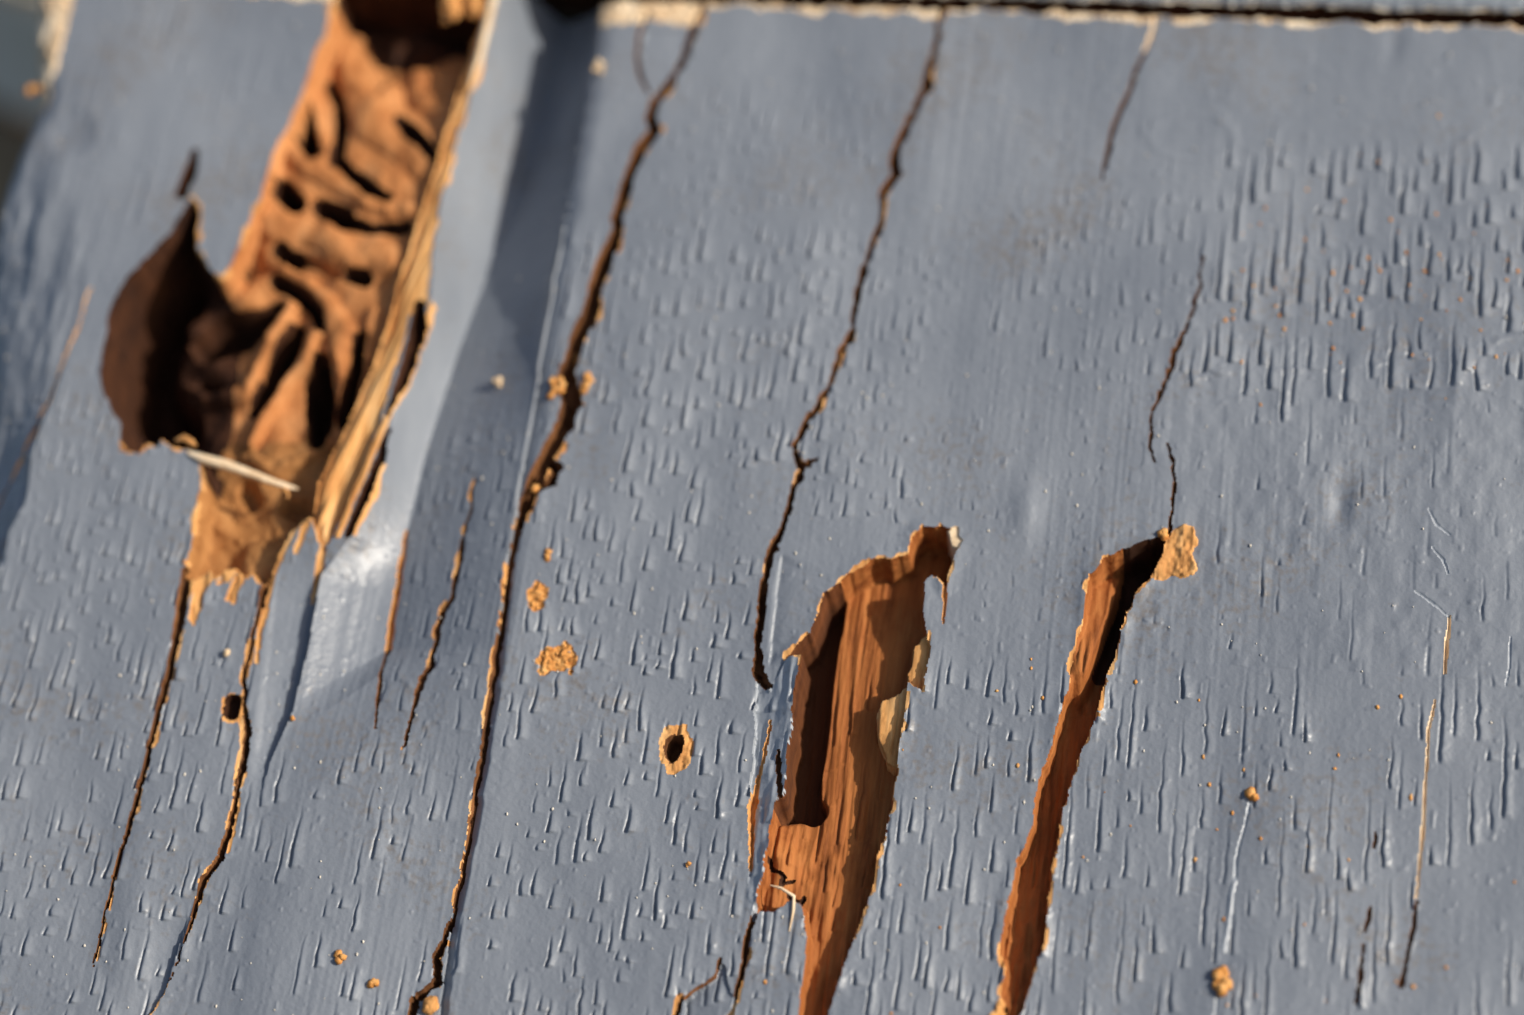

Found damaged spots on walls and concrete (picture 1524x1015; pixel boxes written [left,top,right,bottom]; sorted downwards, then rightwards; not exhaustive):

crack [1101,16,1158,180]
crack [92,565,195,967]
crack [149,585,268,1015]
spalling [100,0,497,664]
crack [374,479,477,750]
crack [407,4,707,1015]
crack [672,856,807,1015]
peeling [746,656,799,922]
crack [753,8,949,678]
crack [1148,256,1205,536]